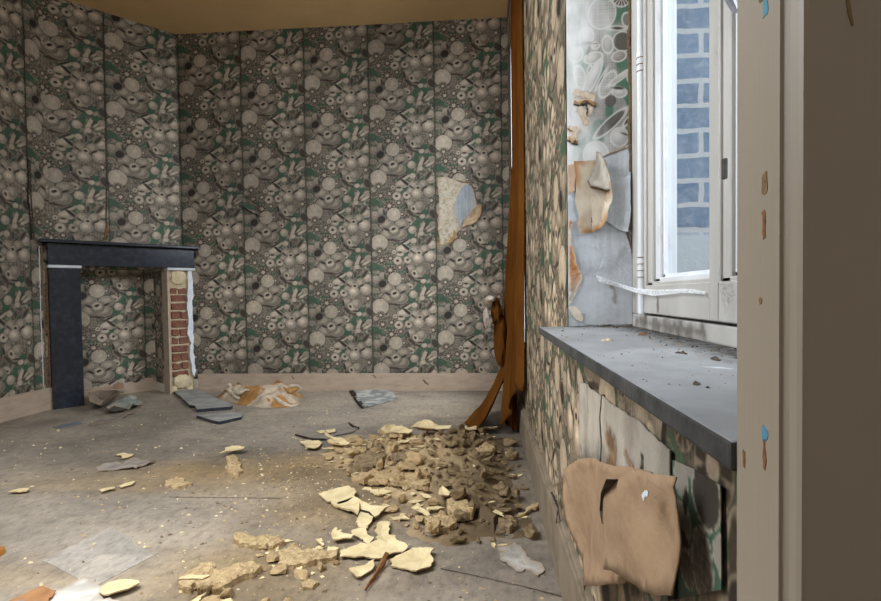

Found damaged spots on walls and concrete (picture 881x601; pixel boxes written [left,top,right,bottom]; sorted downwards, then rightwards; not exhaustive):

flaking render [453,184,477,227]
peeling [568,151,613,322]
spalling [606,428,643,469]